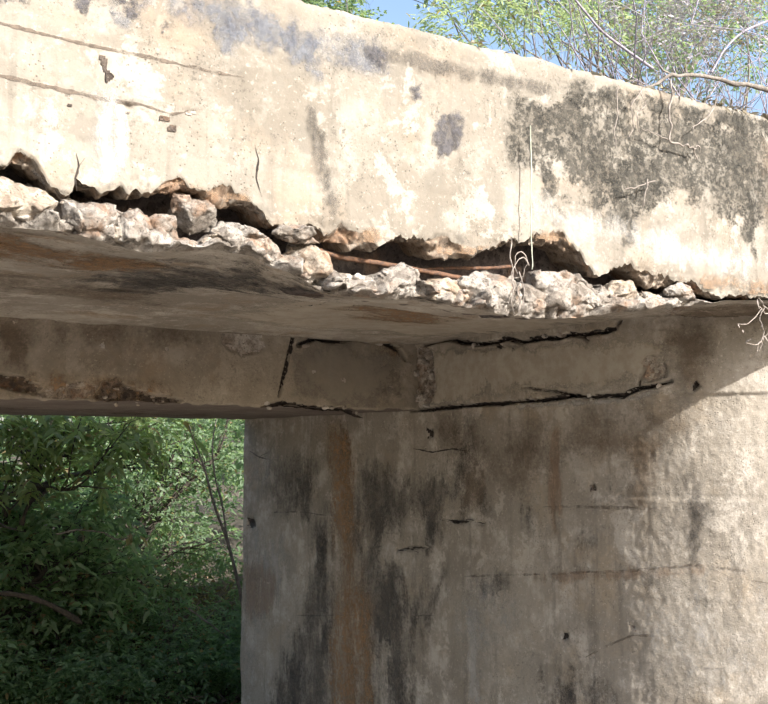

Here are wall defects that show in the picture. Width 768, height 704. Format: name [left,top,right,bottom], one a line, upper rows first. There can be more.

leakage [506,81,768,276]
spalling [0,151,768,320]
rust [438,246,485,255]
spalling [0,375,37,394]
spalling [95,377,179,407]
crack [264,338,362,418]
crack [375,344,398,353]
crack [423,324,621,350]
crack [420,380,670,412]
leakage [689,497,708,565]
leakage [270,459,334,704]
leakage [352,462,443,704]